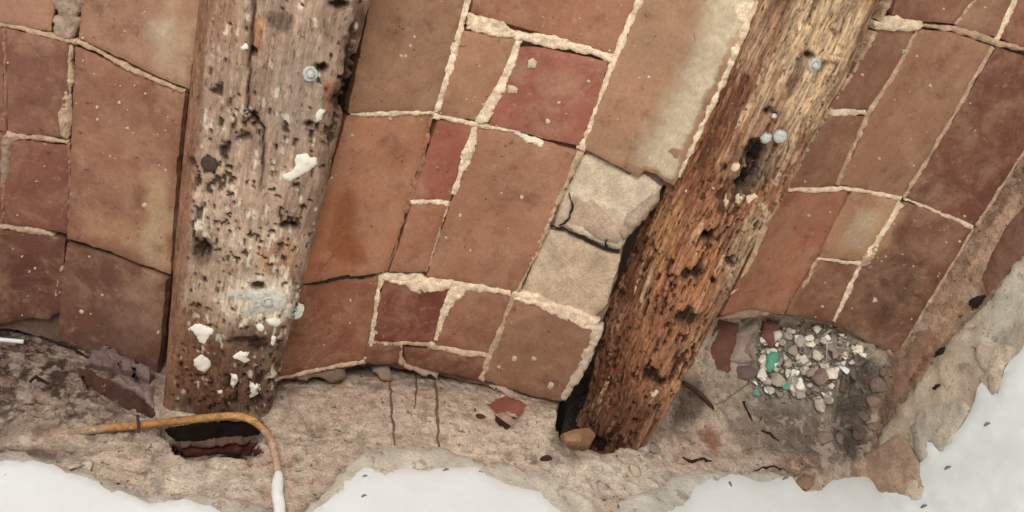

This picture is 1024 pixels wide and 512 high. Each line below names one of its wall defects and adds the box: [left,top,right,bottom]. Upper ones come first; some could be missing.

crack [550,193,619,252]
spalling [77,345,156,419]
spalling [165,420,266,458]
crack [389,374,440,447]
spalling [540,450,561,466]
spalling [703,309,772,381]
peeling [866,400,971,500]
peeling [975,342,1016,395]